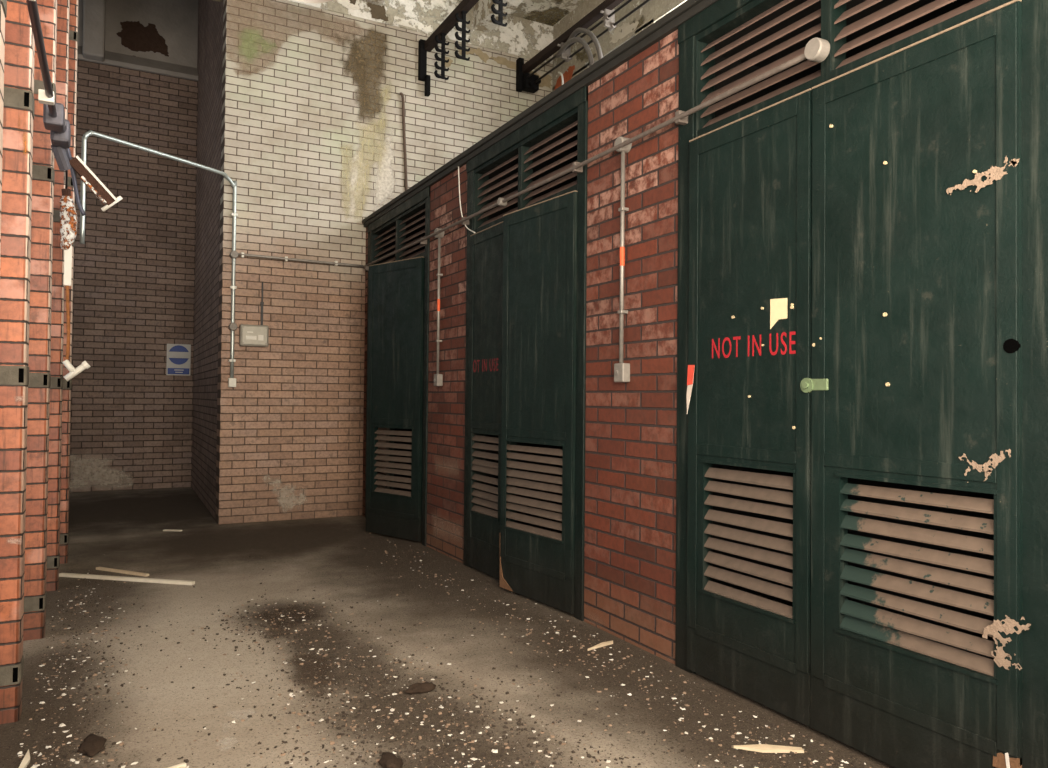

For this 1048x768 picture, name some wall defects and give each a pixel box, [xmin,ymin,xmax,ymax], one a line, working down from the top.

peeling [337,0,433,32]
peeling [609,21,639,43]
damp [345,30,387,119]
damp [347,138,394,215]